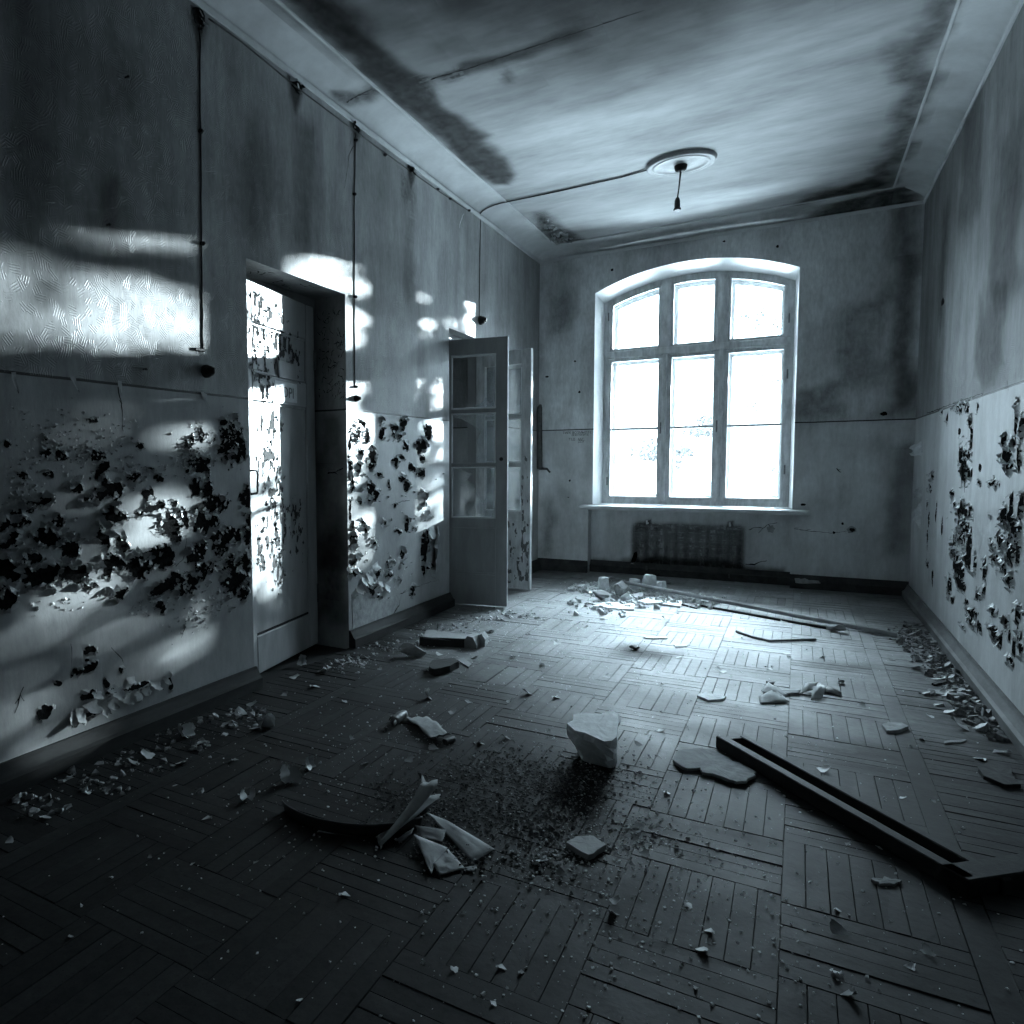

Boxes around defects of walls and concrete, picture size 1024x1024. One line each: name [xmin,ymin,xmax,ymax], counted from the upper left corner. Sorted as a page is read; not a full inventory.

damp [291,0,512,184]
damp [426,0,706,79]
peeling [0,290,304,645]
spalling [347,415,444,629]
peeling [913,396,1024,672]
peeling [34,703,56,725]
peeling [51,644,175,728]